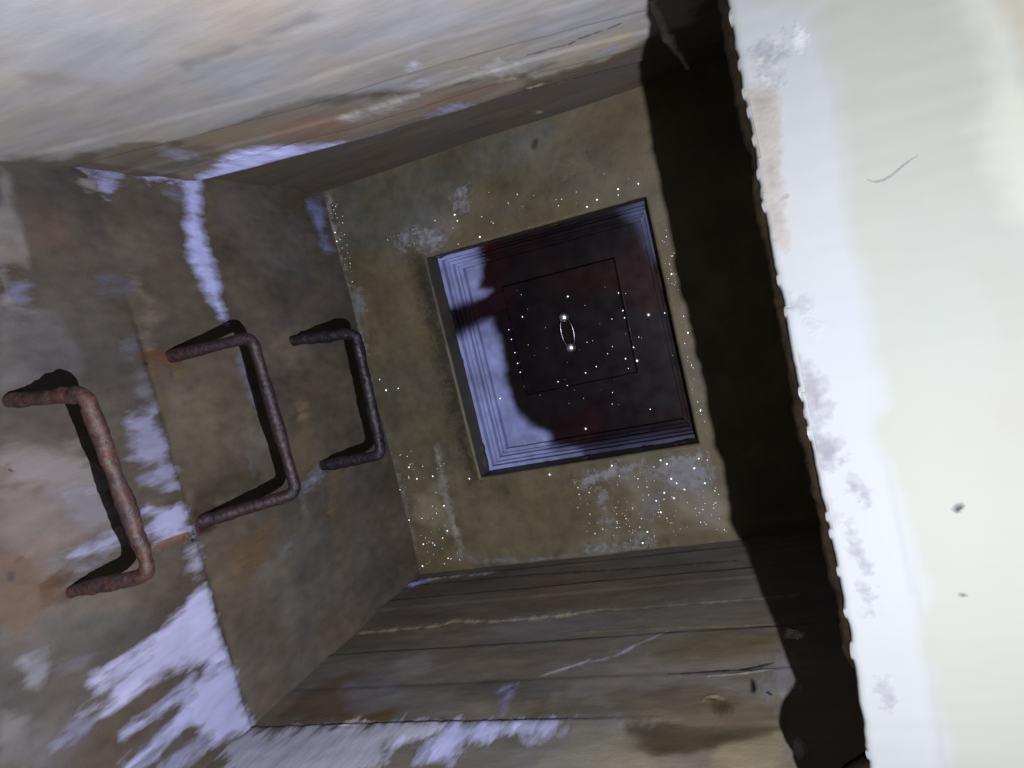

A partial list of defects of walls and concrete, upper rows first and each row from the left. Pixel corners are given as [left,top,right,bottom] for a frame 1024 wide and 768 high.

efflorescence [77,167,124,193]
efflorescence [145,137,365,319]
efflorescence [576,448,716,554]
efflorescence [53,583,559,768]